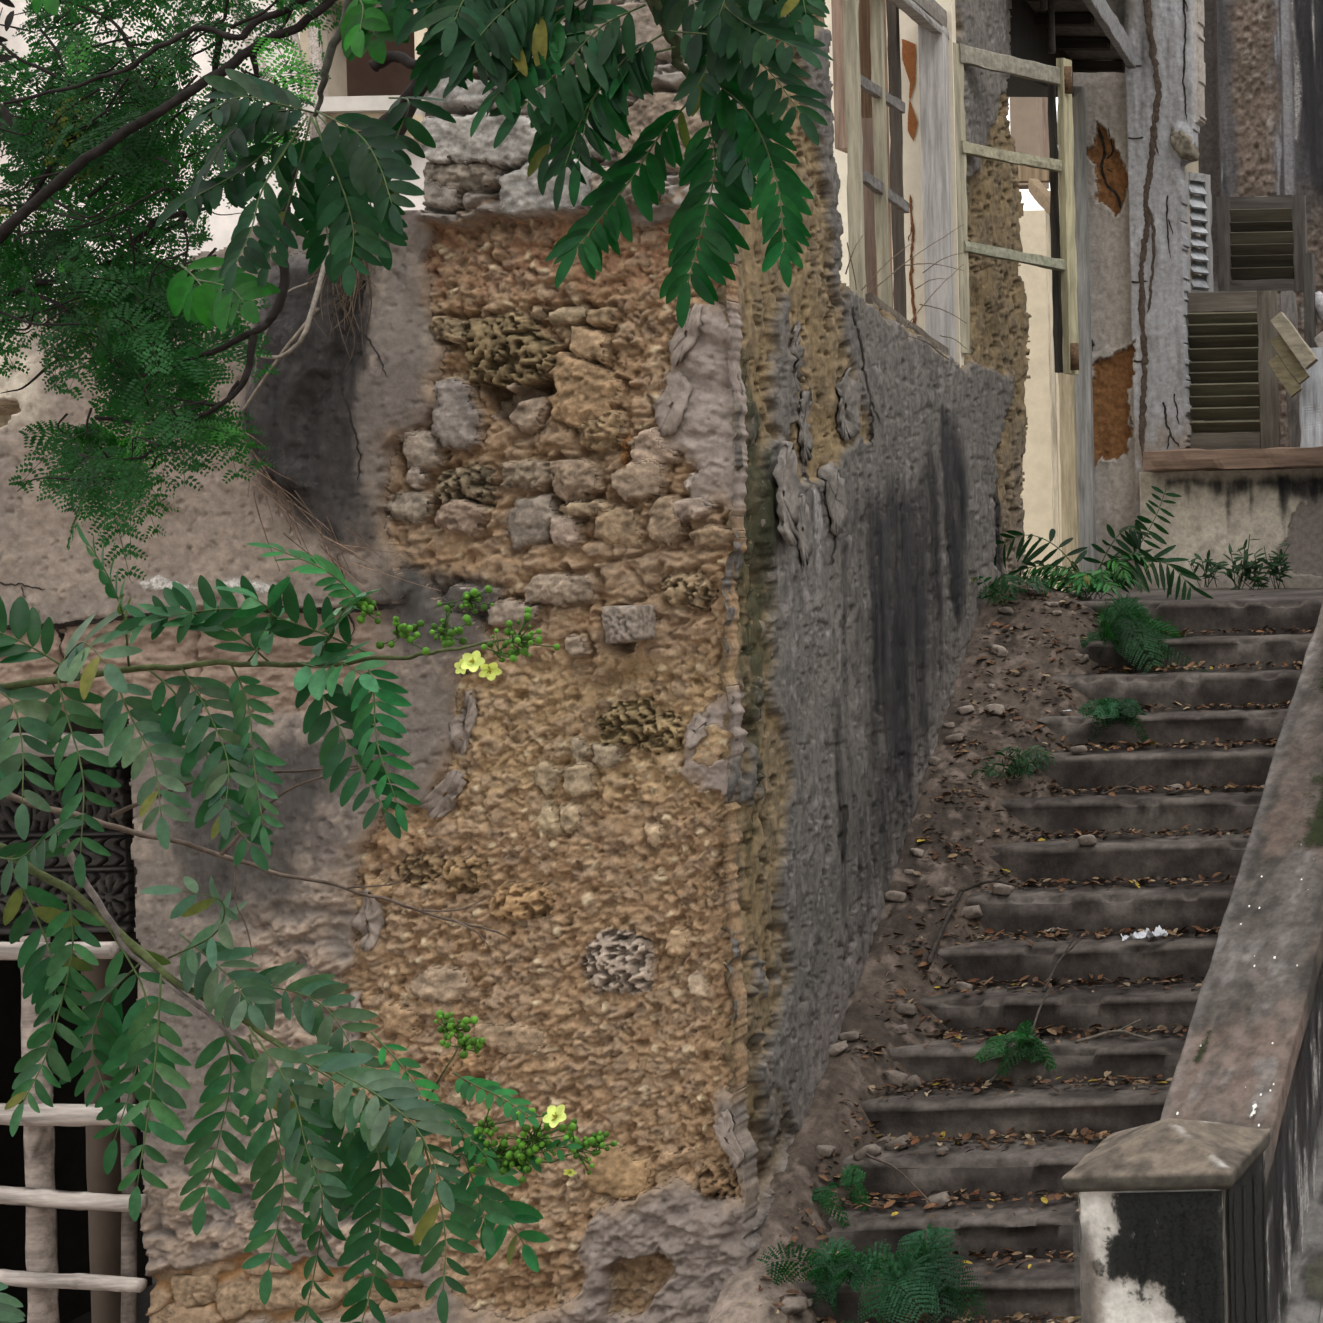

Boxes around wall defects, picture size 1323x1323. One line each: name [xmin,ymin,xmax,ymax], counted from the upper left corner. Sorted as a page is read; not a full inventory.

flaking render [902,39,918,141]
flaking render [1087,119,1128,218]
crack [1098,0,1188,466]
flaking render [0,401,22,427]
flaking render [1092,340,1136,467]
water stain [802,472,822,571]
water stain [1166,476,1323,512]
water stain [837,408,967,897]
flaking render [330,207,749,1321]
water stain [1073,984,1323,1323]
flaking render [146,1253,435,1323]